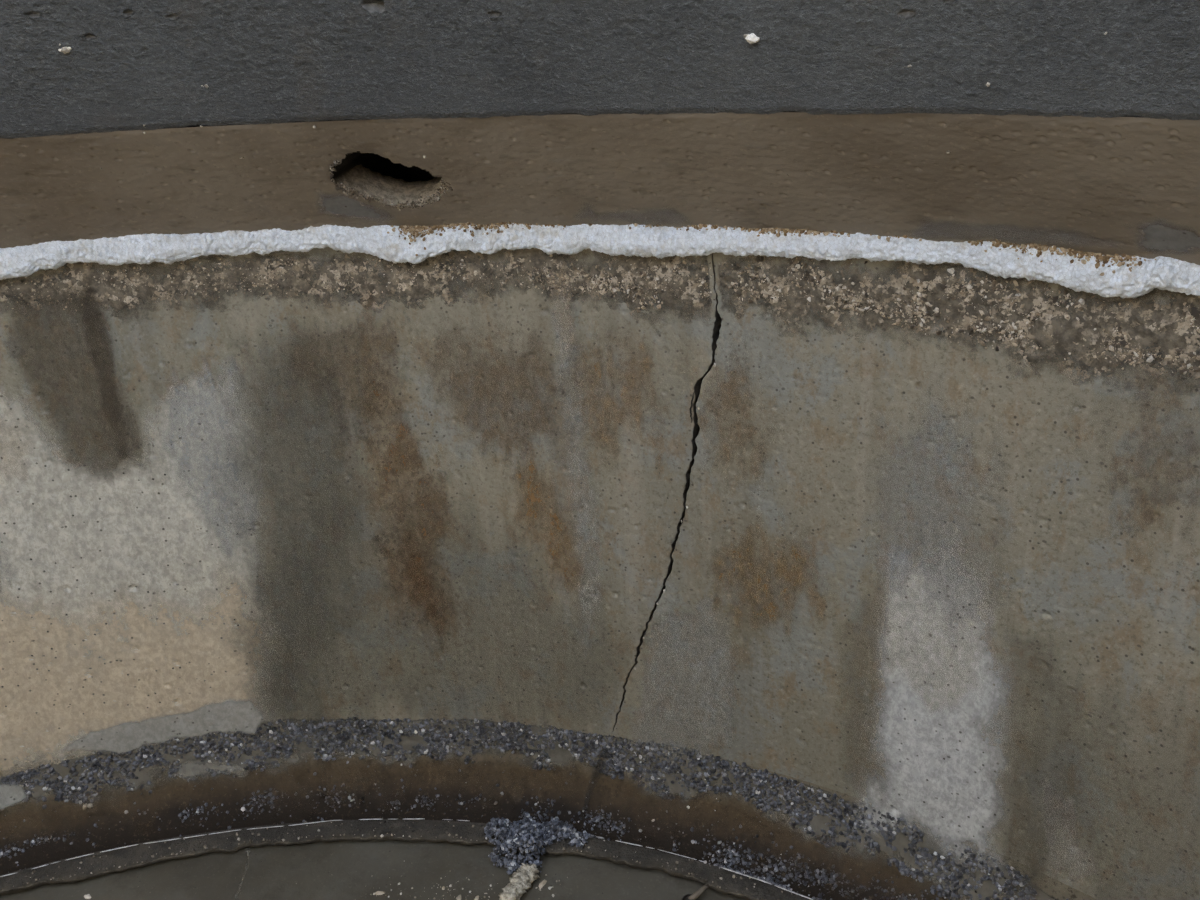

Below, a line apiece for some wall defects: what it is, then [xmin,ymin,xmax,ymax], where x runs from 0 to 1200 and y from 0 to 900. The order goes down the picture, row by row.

spalling [329,151,453,211]
water stain [0,295,270,768]
crack [585,253,722,807]
water stain [866,556,1005,854]